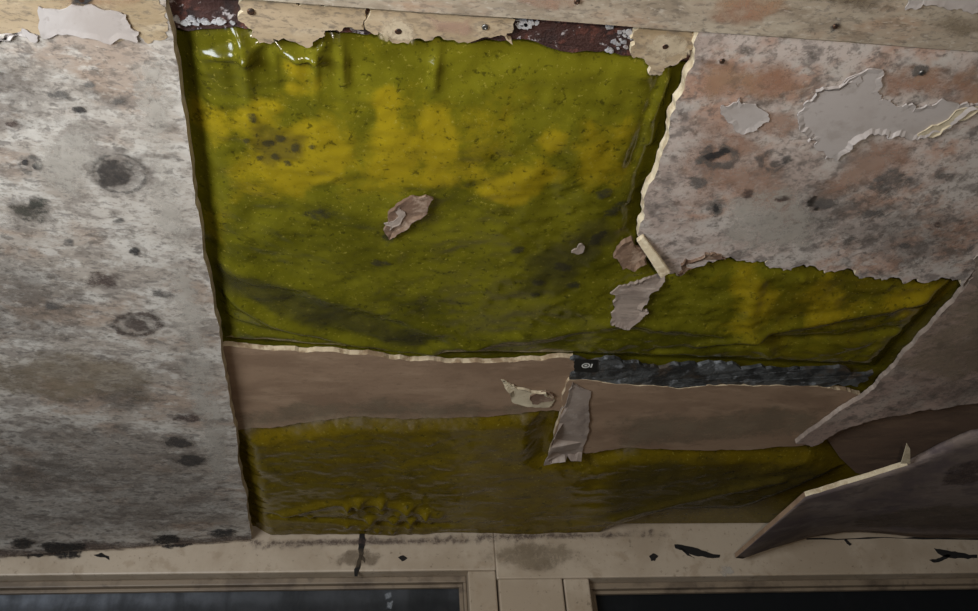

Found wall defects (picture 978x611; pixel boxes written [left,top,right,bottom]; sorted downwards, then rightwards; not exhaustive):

peeling [905,0,978,14]
water stain [381,17,413,41]
peeling [515,18,539,30]
peeling [605,25,632,54]
water stain [646,35,689,59]
peeling [720,99,770,135]
peeling [797,68,978,161]
water stain [257,135,315,165]
water stain [20,91,188,247]
water stain [10,198,47,221]
water stain [88,272,116,287]
water stain [112,312,163,336]